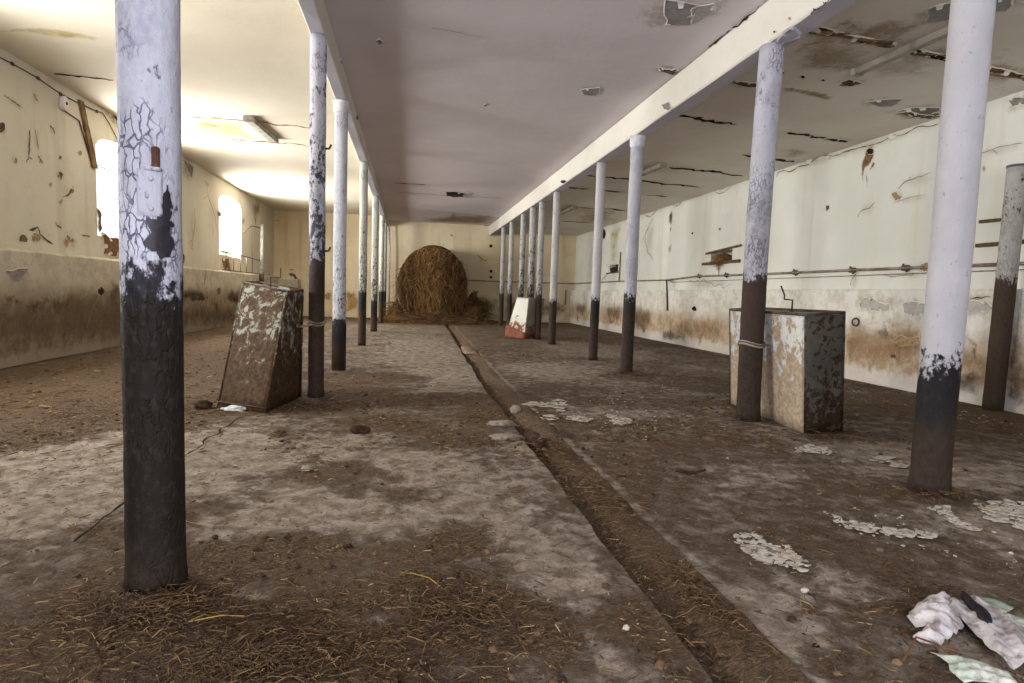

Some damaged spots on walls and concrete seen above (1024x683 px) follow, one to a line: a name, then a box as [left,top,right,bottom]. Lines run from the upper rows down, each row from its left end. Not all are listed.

peeling [663,0,717,26]
peeling [925,2,951,24]
peeling [996,0,1014,12]
crack [679,115,735,125]
flaking render [865,98,941,119]
crack [776,124,937,177]
rust [862,149,874,179]
crack [563,155,751,260]
peeling [143,185,185,264]
water stain [0,288,120,345]
water stain [183,291,238,324]
crack [73,502,124,542]